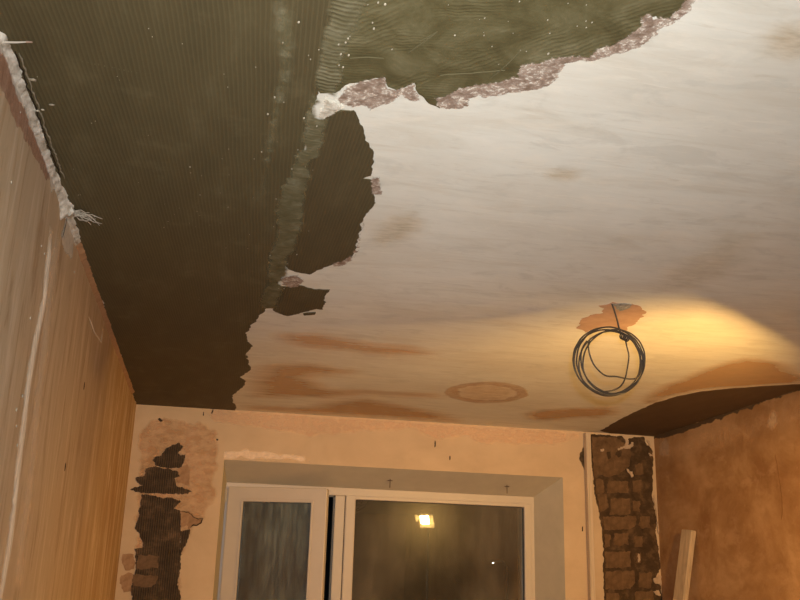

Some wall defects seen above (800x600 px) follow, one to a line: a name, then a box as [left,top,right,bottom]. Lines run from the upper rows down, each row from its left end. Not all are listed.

spalling [0,0,695,410]
leakage [659,362,796,395]
spalling [120,419,216,600]
spalling [591,384,800,600]